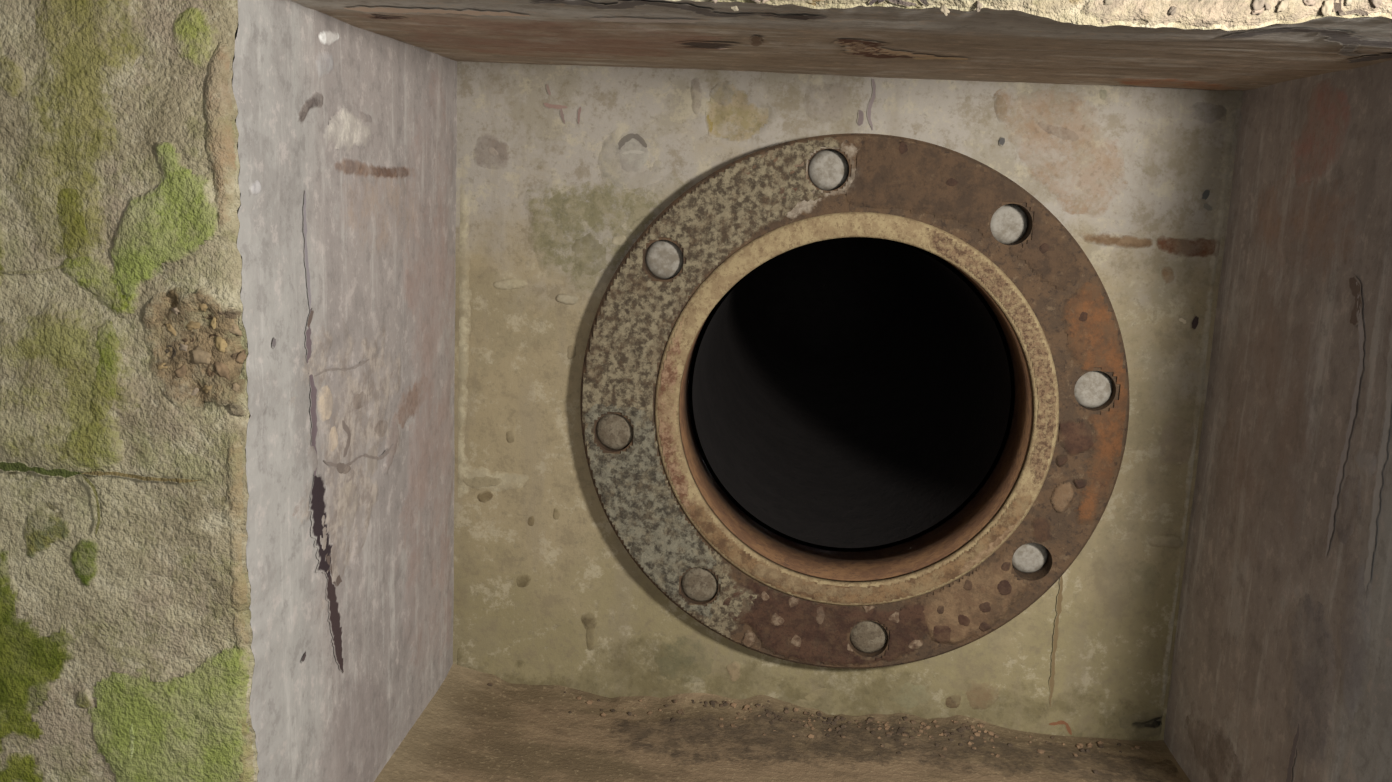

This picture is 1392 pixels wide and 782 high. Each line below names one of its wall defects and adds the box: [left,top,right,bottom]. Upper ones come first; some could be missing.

peeling [172,7,221,71]
peeling [60,142,247,417]
crack [303,191,344,672]
rust [658,317,697,518]
rust [844,137,1216,489]
rust [723,547,1017,667]